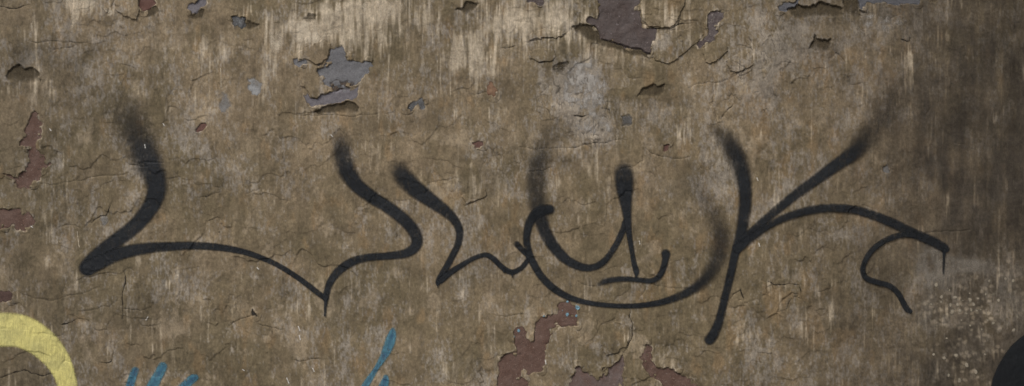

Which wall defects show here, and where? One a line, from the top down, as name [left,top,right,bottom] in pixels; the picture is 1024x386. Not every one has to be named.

peeling [139,0,158,17]
peeling [187,0,207,18]
peeling [574,0,657,58]
peeling [697,6,724,48]
spalling [773,0,924,17]
spalling [7,65,41,81]
peeling [293,15,373,114]
peeling [0,111,51,190]
peeling [0,204,36,233]
peeling [497,300,582,386]
peeling [569,355,624,386]
peeling [640,337,698,386]